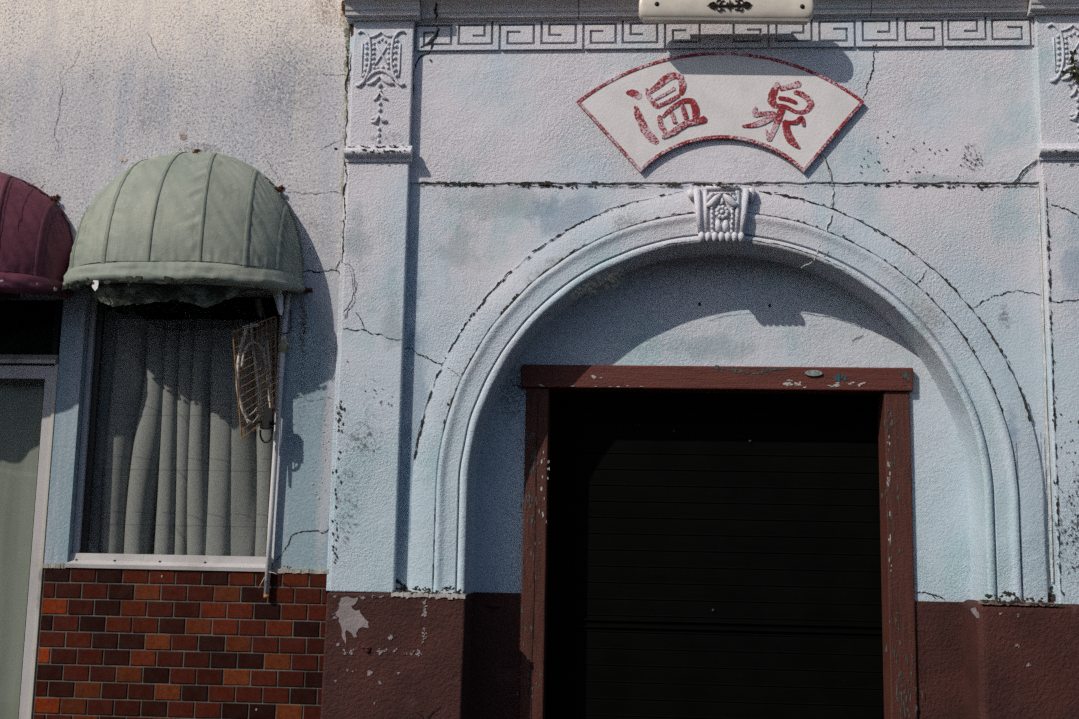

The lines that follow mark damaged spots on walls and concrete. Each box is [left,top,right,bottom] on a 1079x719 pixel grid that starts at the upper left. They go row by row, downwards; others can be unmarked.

crack [750,153,846,270]
crack [304,259,462,378]
crack [976,159,1079,601]
crack [276,530,328,561]
peeling [333,595,384,655]
peeling [376,507,436,657]
leakage [1050,439,1079,583]